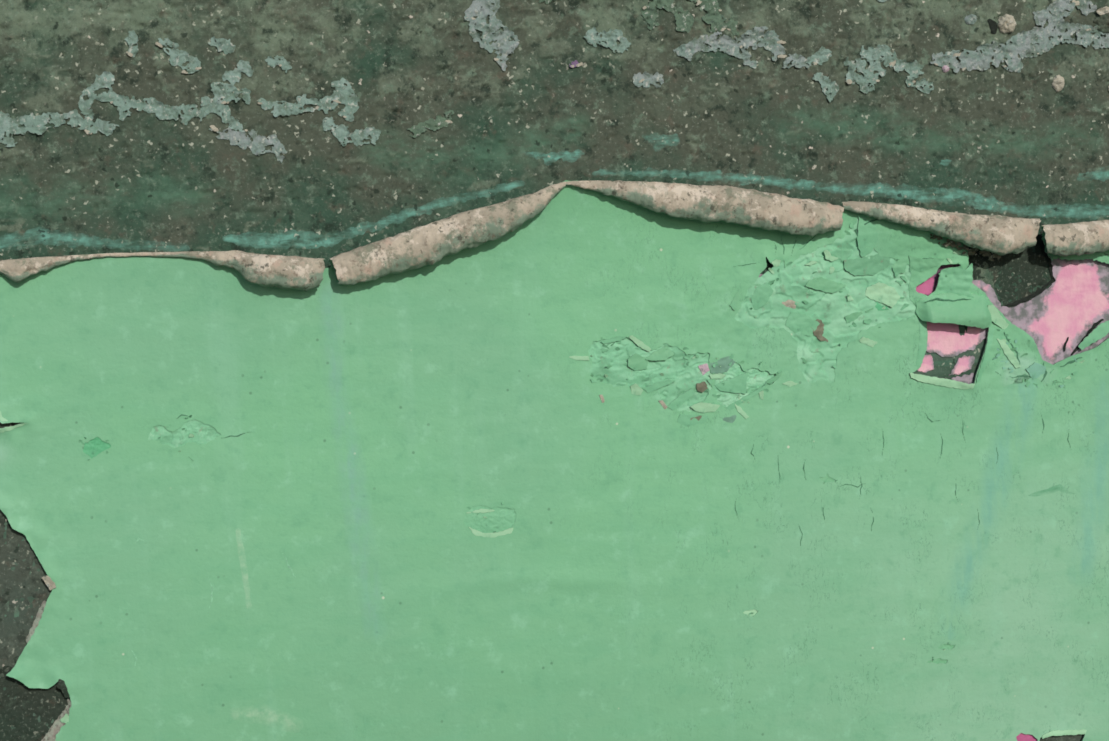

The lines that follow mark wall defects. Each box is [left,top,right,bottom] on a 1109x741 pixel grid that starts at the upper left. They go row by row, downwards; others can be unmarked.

spalling [987,19,998,34]
peeling [570,215,1109,427]
peeling [0,411,27,433]
peeling [0,510,71,741]
peeling [1016,729,1087,741]